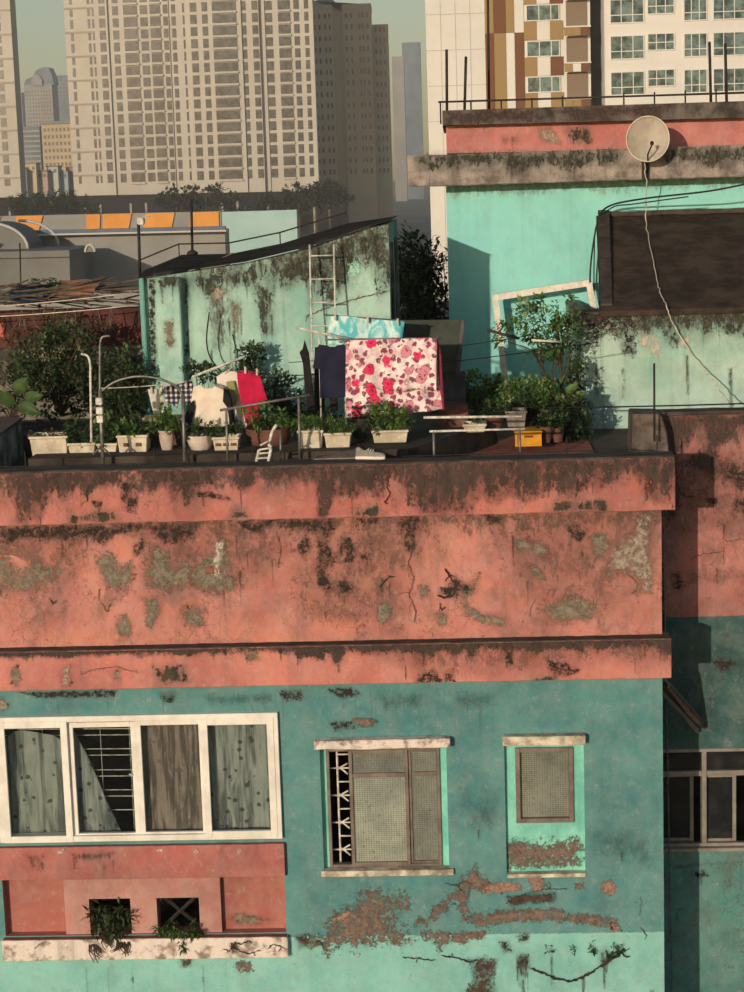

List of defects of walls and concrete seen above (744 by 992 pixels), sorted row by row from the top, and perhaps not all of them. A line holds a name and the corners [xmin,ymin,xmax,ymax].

leakage [416,105,661,172]
leakage [664,145,744,168]
leakage [148,224,393,382]
leakage [0,414,744,596]
peeling [93,535,244,637]
peeling [536,593,603,626]
peeling [591,513,656,595]
peeling [352,717,378,728]
flaking render [294,834,622,959]
leakage [464,955,499,992]
leakage [499,933,529,992]
crack [530,896,647,983]